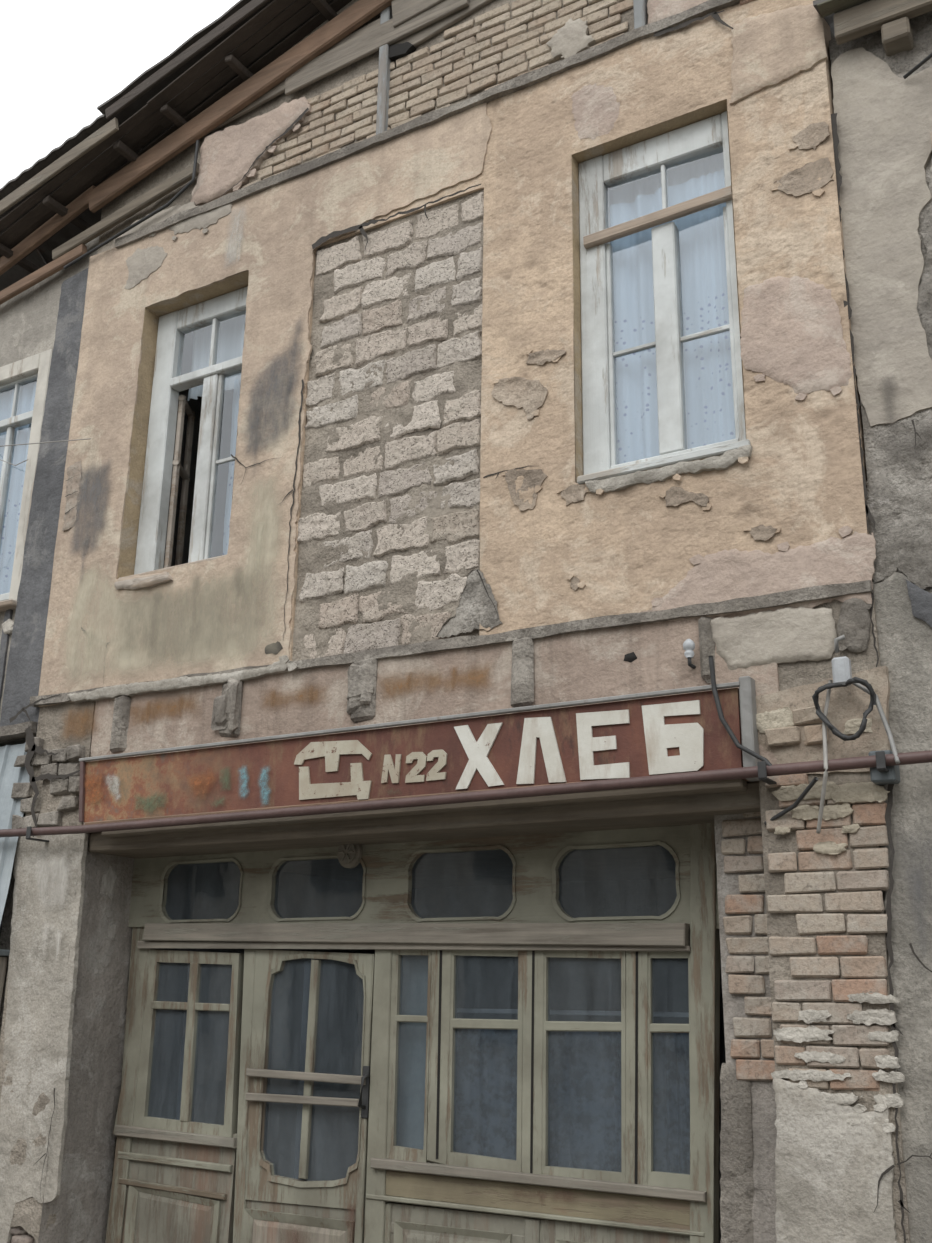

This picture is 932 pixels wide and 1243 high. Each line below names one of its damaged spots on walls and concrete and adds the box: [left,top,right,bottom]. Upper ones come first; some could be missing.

peeling [114,97,312,290]
crack [312,184,481,250]
flaking render [502,469,604,511]
flaking render [659,474,712,511]
peeling [651,525,876,624]
spalling [11,737,120,829]
flaking render [755,666,905,1243]